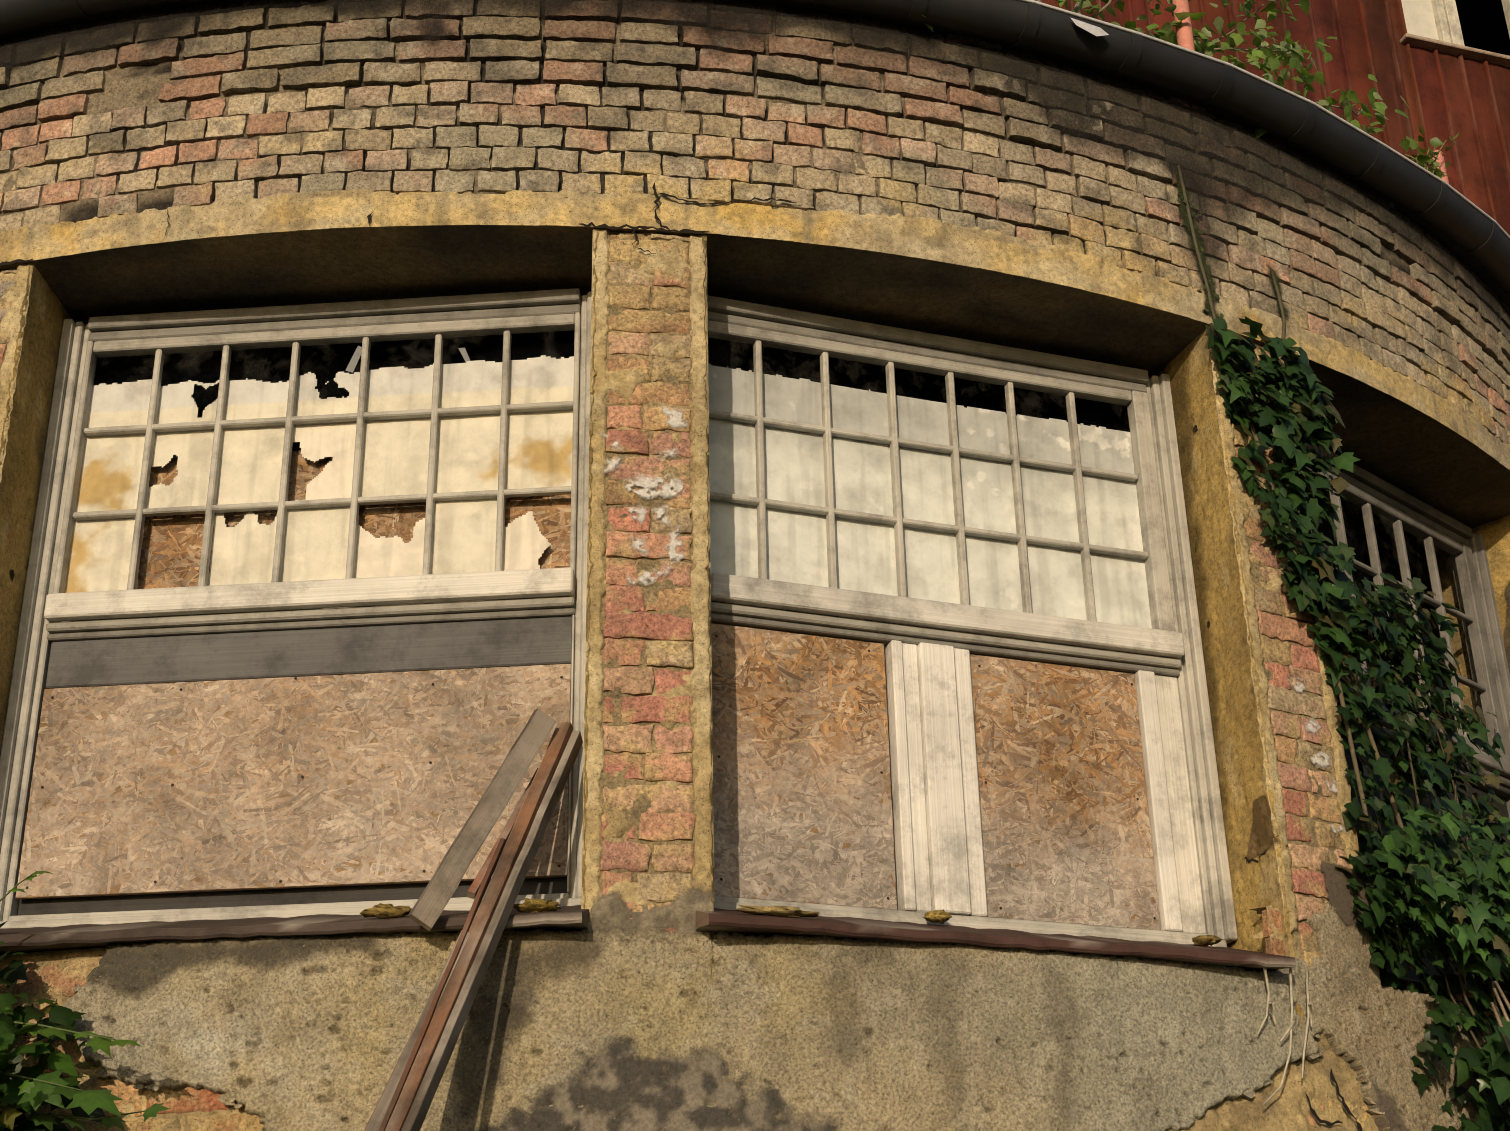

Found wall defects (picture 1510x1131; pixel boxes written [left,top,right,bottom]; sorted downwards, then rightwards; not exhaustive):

crack [580,183,796,254]
flaking render [0,948,264,1131]
leakage [453,937,837,1131]
flaking render [1166,1032,1385,1131]